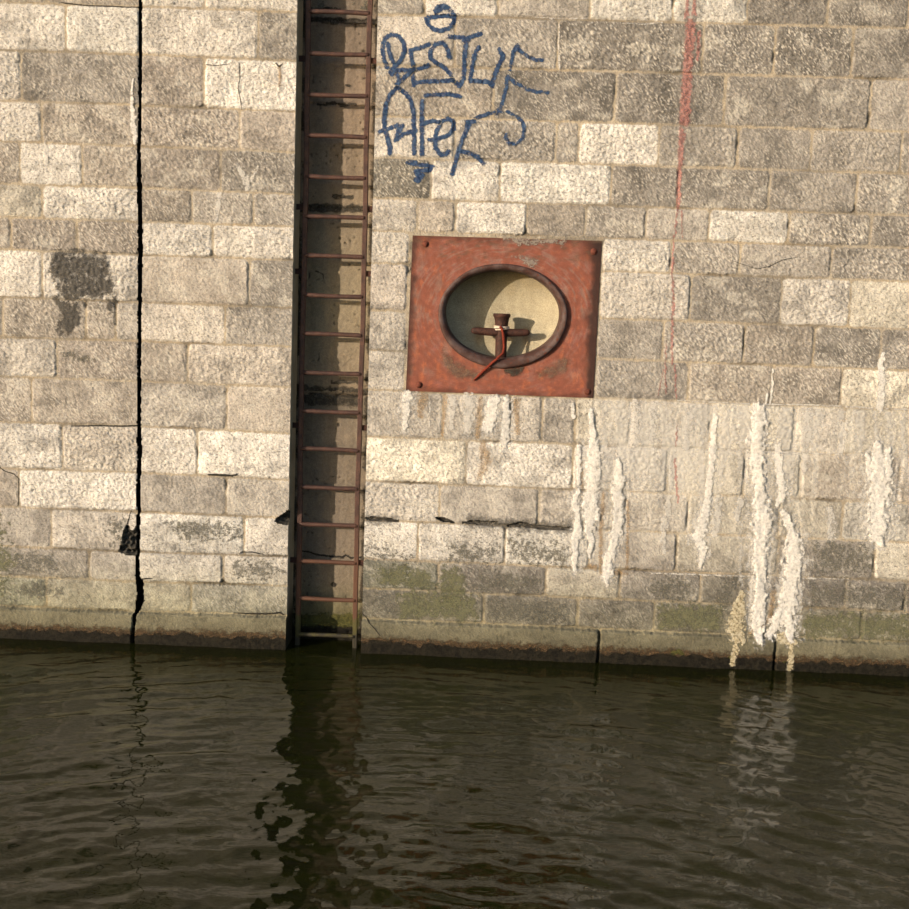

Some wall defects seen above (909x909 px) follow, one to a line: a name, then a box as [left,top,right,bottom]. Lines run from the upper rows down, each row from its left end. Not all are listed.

crack [61,0,152,630]
spalling [118,524,141,556]
damp [358,0,909,677]